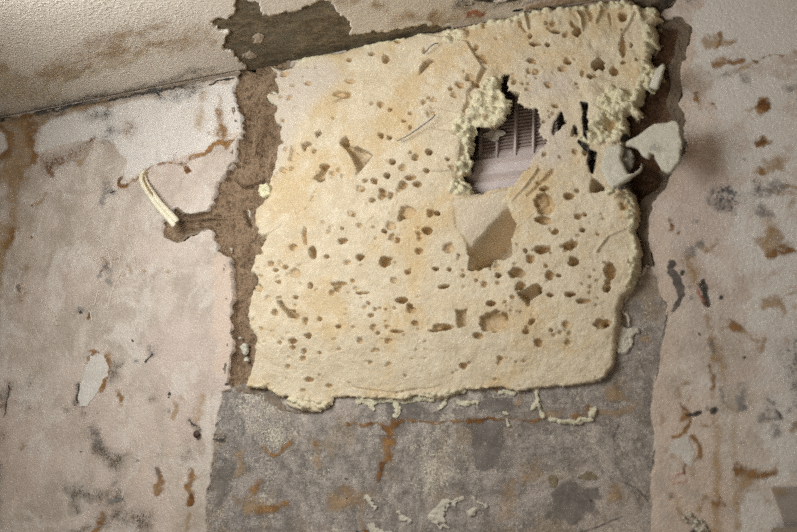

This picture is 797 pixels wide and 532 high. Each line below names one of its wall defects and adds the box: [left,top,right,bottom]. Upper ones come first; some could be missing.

leakage [0,169,20,284]
peeling [162,0,691,532]
peeling [78,349,123,407]
leakage [758,340,797,437]
rust [245,482,288,513]
rust [346,417,508,488]